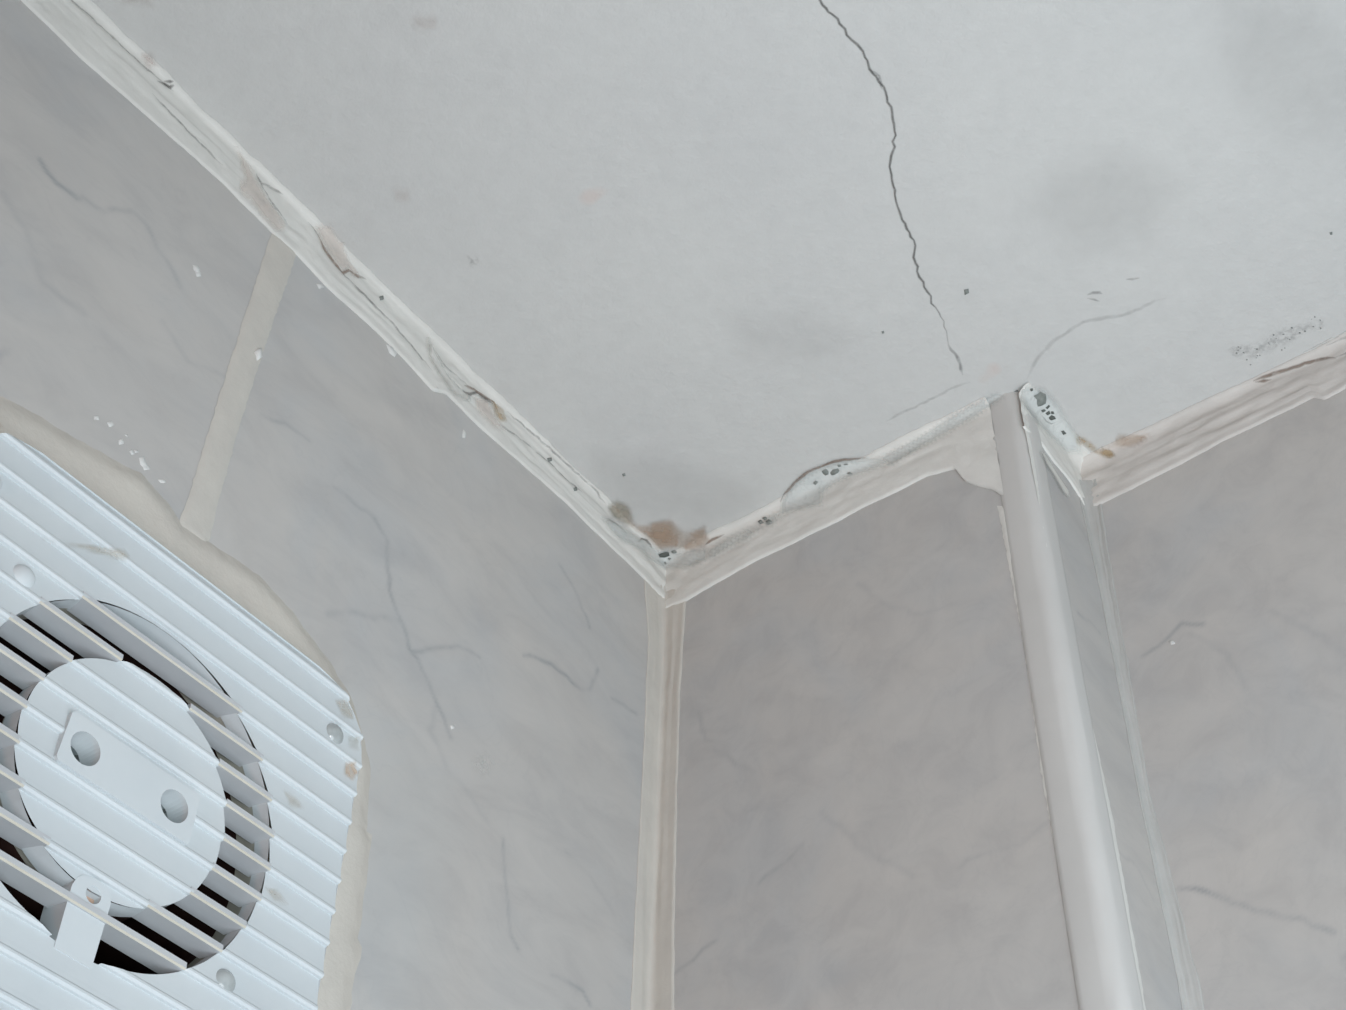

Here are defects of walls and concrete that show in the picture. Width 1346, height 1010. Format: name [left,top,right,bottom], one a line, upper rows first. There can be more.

crack [819,0,934,306]
peeling [430,345,503,419]
spalling [783,395,1001,510]
spalling [1021,388,1079,450]